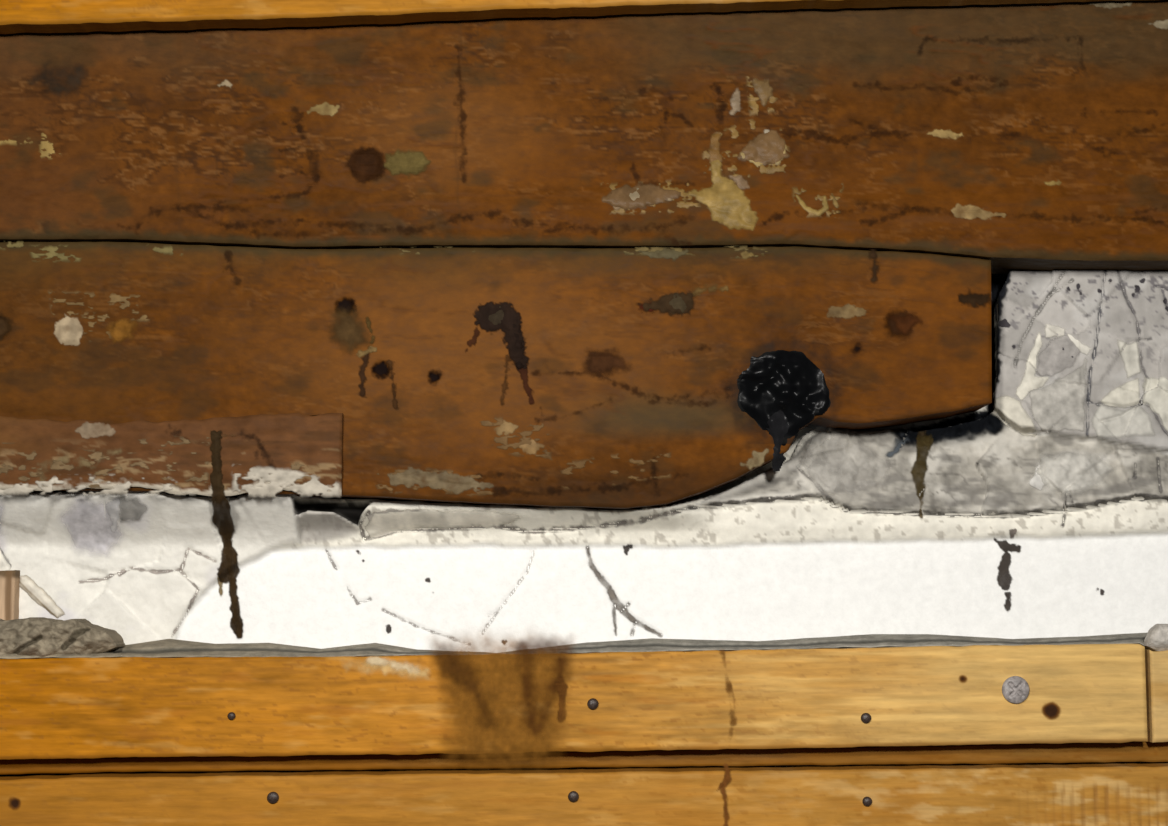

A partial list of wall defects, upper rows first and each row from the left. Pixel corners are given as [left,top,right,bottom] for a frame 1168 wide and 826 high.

peeling [602,76,789,230]
peeling [793,184,843,216]
peeling [624,247,689,259]
peeling [728,245,767,259]
rust [466,302,534,405]
peeling [0,439,149,488]
peeling [233,463,340,497]
crack [326,270,1168,644]
rust [210,431,243,638]
crack [79,549,216,633]
damp [438,638,569,758]